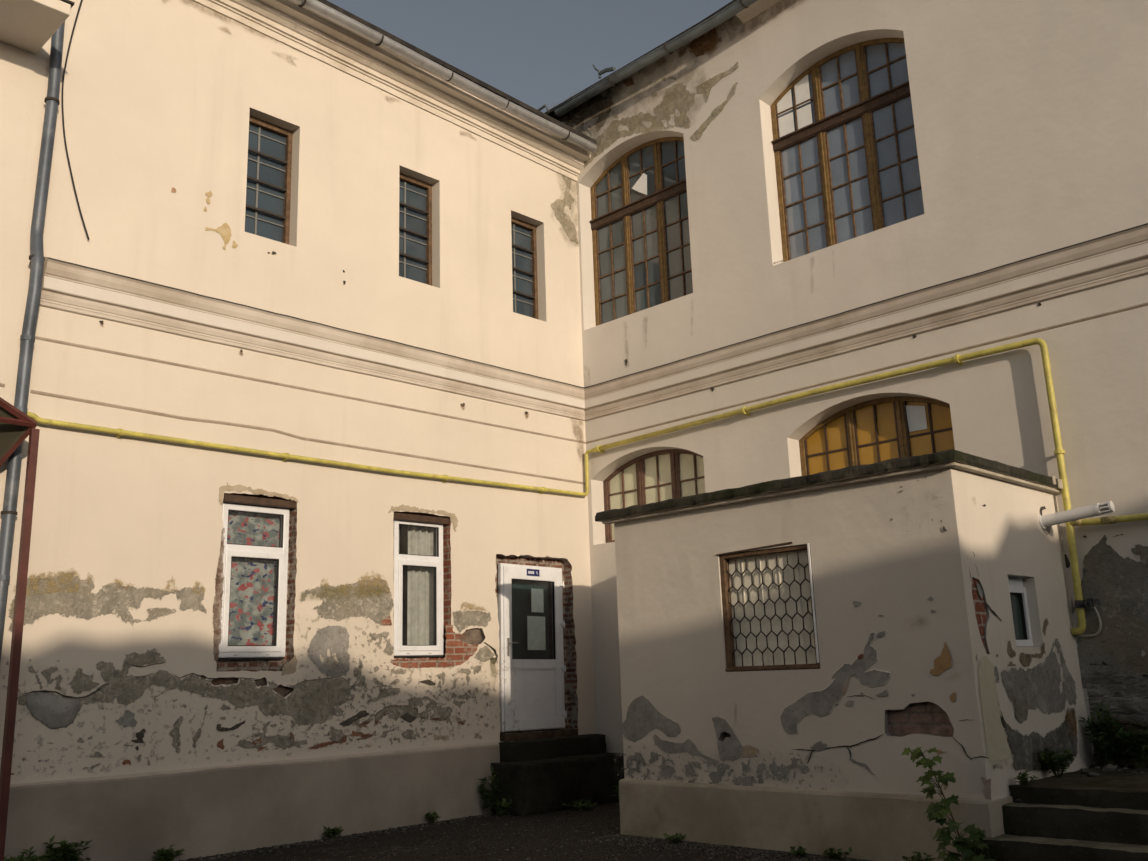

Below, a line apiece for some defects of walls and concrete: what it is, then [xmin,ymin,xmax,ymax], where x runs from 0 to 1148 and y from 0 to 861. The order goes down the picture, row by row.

peeling [551,62,738,168]
peeling [205,223,238,249]
peeling [551,176,578,244]
peeling [219,482,298,505]
peeling [9,528,225,661]
peeling [17,575,491,765]
peeling [619,695,832,789]
peeling [780,631,891,734]
crack [793,734,883,775]
flaking render [884,693,956,754]
peeling [930,642,951,676]
peeling [969,534,1148,768]